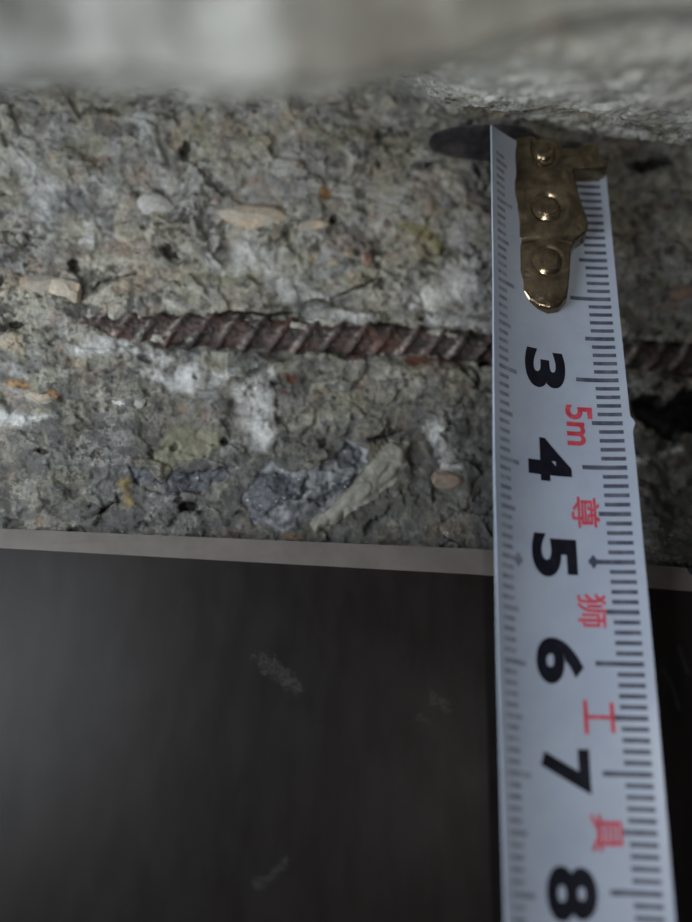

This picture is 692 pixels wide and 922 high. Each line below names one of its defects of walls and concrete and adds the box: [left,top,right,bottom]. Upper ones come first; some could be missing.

spalling [0,72,692,569]
corrosion [405,356,452,367]